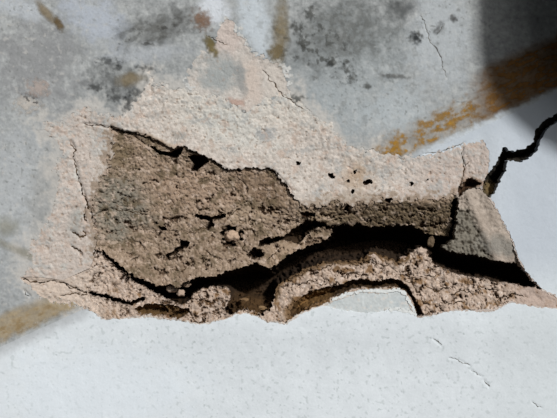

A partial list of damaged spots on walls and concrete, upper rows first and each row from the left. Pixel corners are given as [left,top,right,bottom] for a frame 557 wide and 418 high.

leakage [120,12,185,44]
leakage [195,13,210,27]
leakage [205,37,218,56]
leakage [267,5,374,65]
corrosion [482,37,557,114]
corrosion [382,104,482,155]
spalling [20,16,557,325]
crack [23,113,557,319]